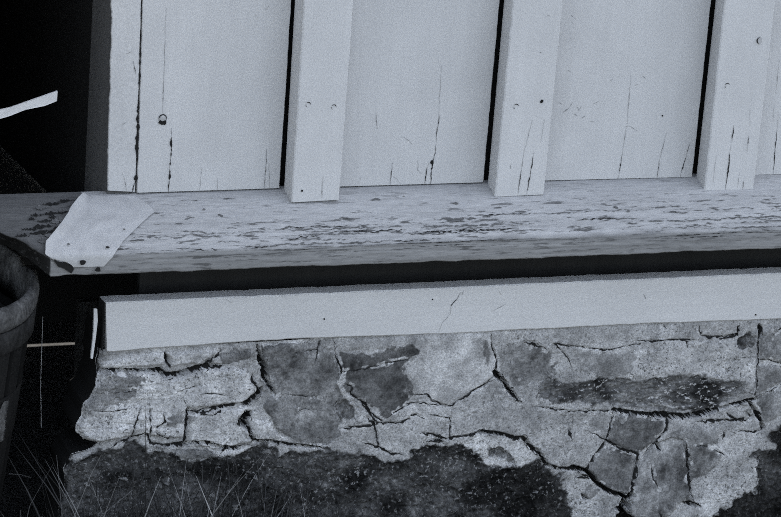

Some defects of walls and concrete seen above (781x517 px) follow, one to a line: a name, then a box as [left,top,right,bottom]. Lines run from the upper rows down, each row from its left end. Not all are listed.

crack [417,122,439,186]
crack [510,120,545,191]
crack [713,127,749,190]
peeling [15,197,78,243]
peeling [116,227,282,257]
peeling [395,207,515,235]
crack [165,208,781,258]
crack [99,344,322,451]